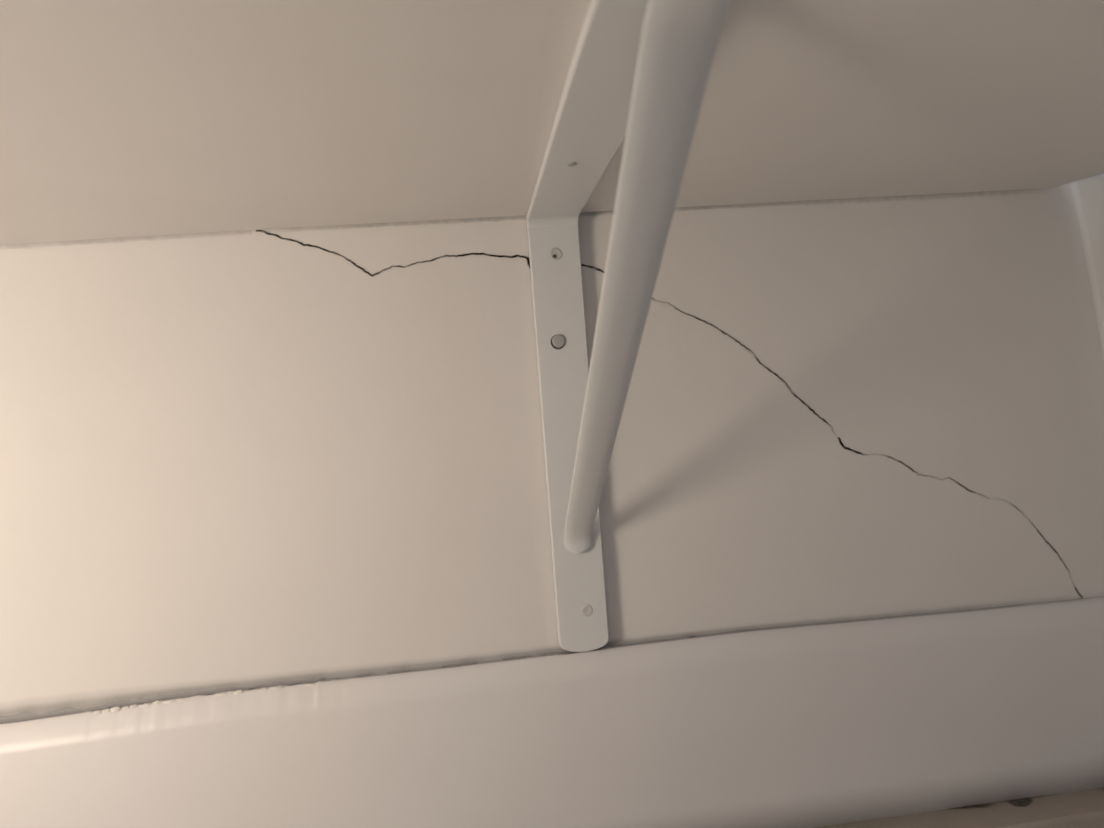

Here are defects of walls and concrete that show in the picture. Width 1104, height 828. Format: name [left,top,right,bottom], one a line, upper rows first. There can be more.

crack [256,230,530,277]
crack [677,309,862,454]
crack [1037,530,1082,597]